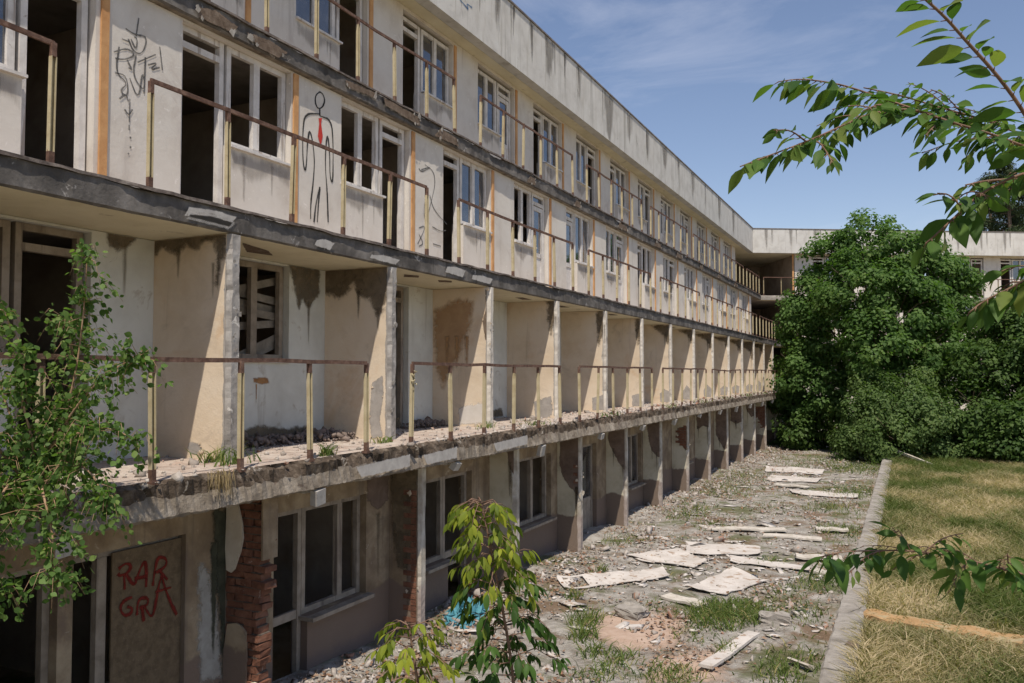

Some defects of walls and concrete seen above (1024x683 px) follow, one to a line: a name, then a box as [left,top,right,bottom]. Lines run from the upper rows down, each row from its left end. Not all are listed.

damp [107,233,135,251]
damp [154,234,226,285]
damp [289,265,387,320]
damp [434,300,472,382]
peeling [357,454,410,477]
damp [198,508,226,681]
flaking render [223,497,278,683]